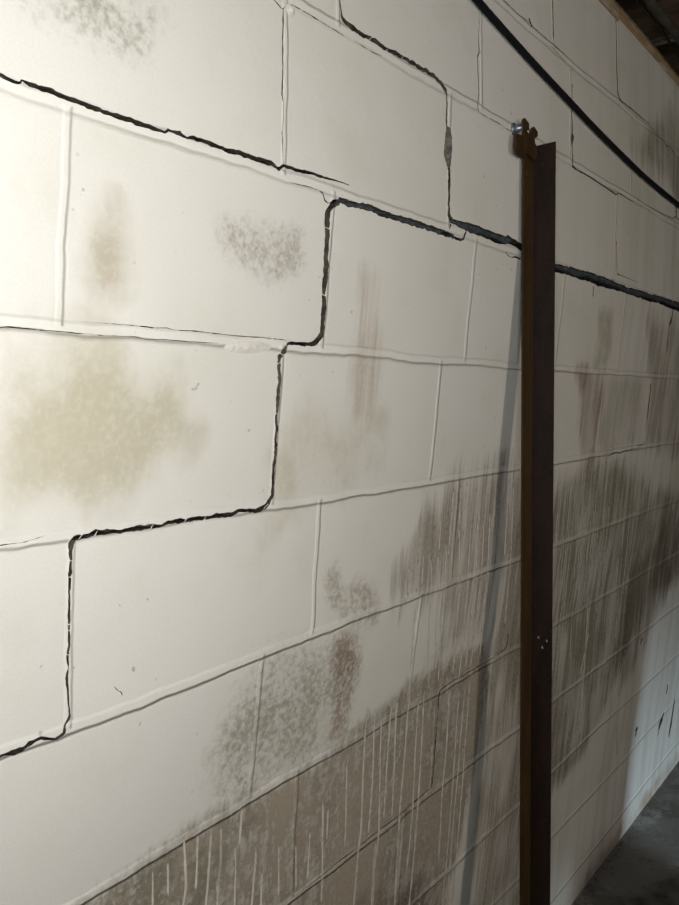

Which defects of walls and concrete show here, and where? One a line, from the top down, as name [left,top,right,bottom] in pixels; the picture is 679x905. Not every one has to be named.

crack [503,0,563,59]
crack [615,20,675,153]
crack [571,112,679,220]
crack [555,241,679,347]
crack [0,0,522,758]
crack [609,385,651,456]
leakage [101,473,521,905]
leakage [546,466,679,783]
crack [306,634,509,888]